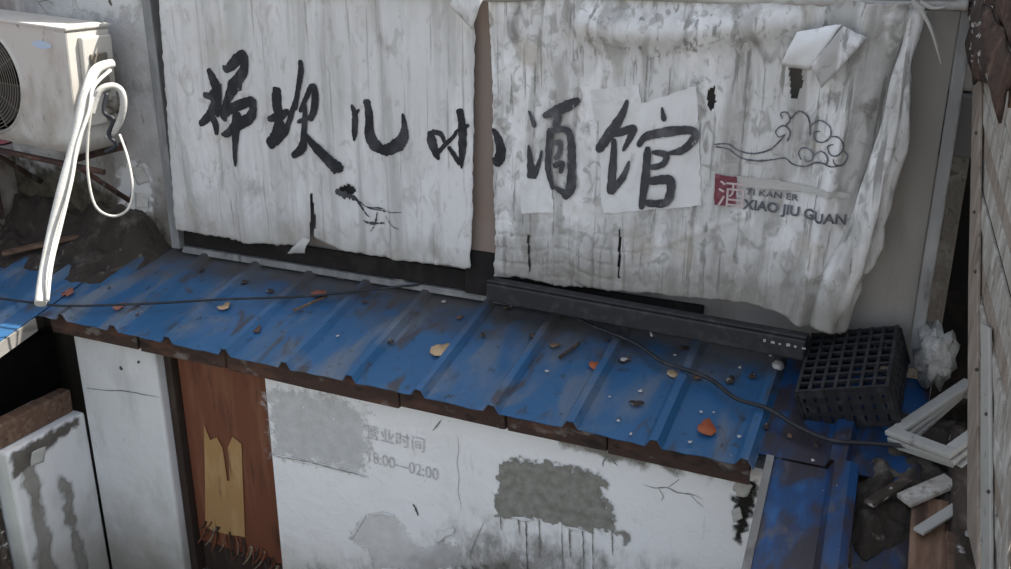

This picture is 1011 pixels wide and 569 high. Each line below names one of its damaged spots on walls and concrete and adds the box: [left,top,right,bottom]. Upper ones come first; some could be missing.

damp [23,465,57,569]
damp [59,477,88,569]
damp [446,536,562,569]
crack [645,479,703,506]